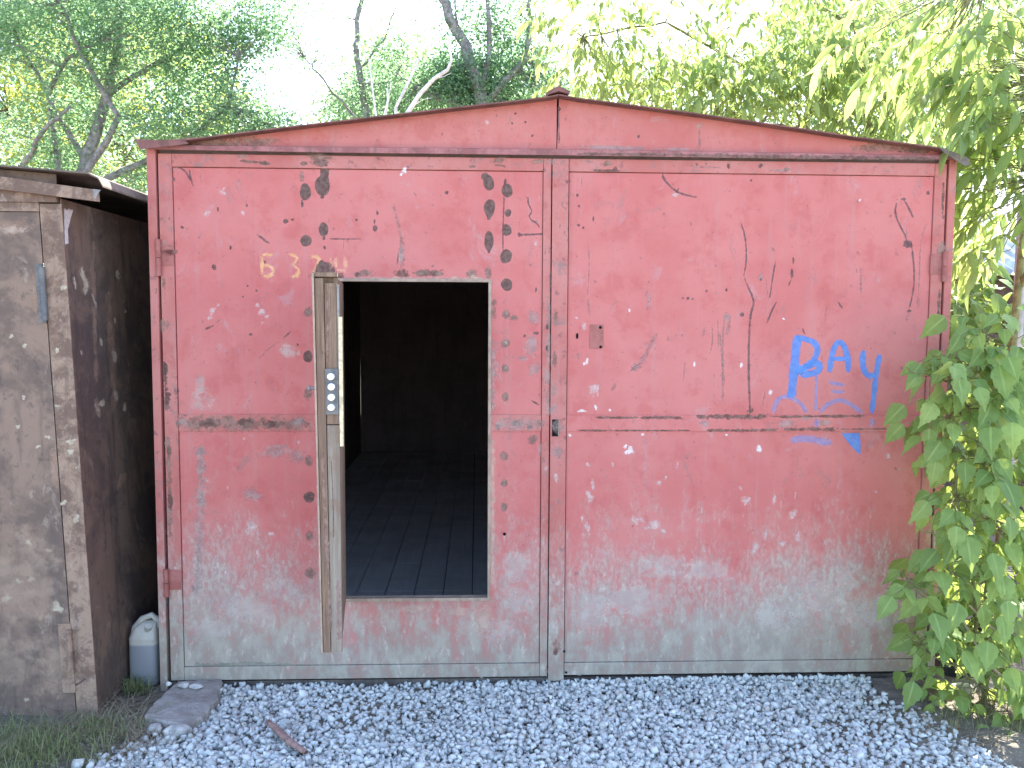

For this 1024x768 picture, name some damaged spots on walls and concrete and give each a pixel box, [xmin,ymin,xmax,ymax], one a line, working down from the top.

corrosion [162,361,310,433]
corrosion [579,414,886,432]
damp [192,446,205,594]